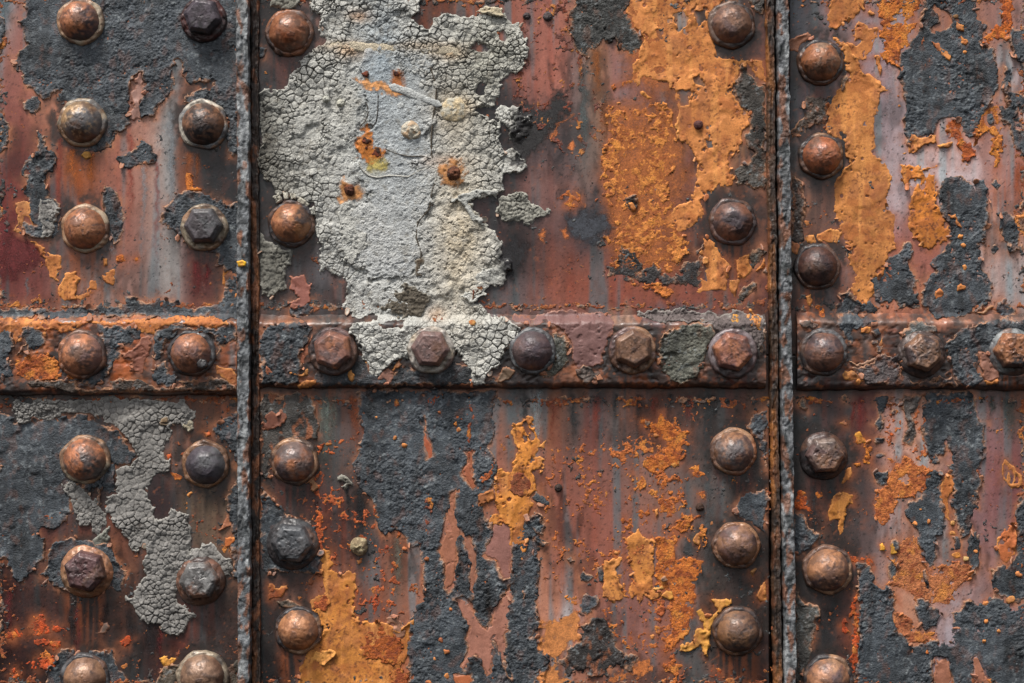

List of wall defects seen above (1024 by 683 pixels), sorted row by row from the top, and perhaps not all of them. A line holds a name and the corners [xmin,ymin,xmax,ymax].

corrosion [0,241,229,344]
peeling [0,0,238,169]
peeling [0,186,238,636]
corrosion [261,497,422,683]
crack [358,52,439,269]
peeling [257,0,643,683]
corrosion [478,396,773,683]
corrosion [478,0,779,311]
corrosion [794,421,978,645]
corrosion [789,0,1024,311]
peeling [836,175,1024,683]
peeling [897,0,1024,156]